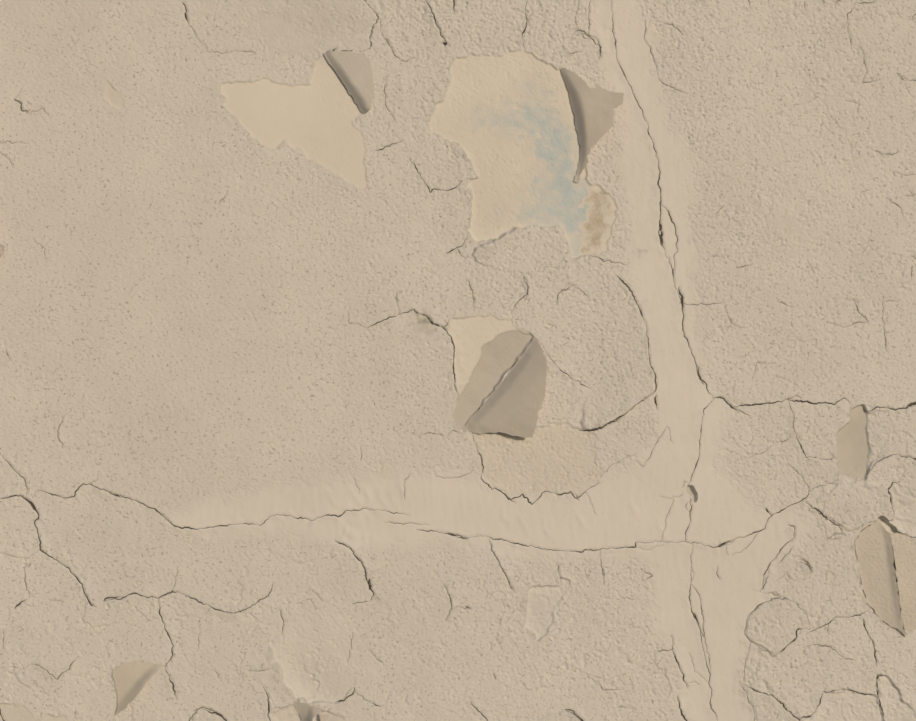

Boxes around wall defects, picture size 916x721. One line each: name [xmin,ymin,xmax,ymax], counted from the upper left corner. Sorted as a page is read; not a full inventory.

peeling [220,50,375,190]
peeling [429,49,624,259]
crack [347,292,459,397]
peeling [448,314,547,438]
crack [376,1,884,721]
crack [866,402,916,412]
crack [0,455,367,696]
crack [337,542,374,603]
peeling [853,482,916,637]
peeling [112,660,164,715]
crack [189,707,227,721]
flaking render [269,610,361,721]